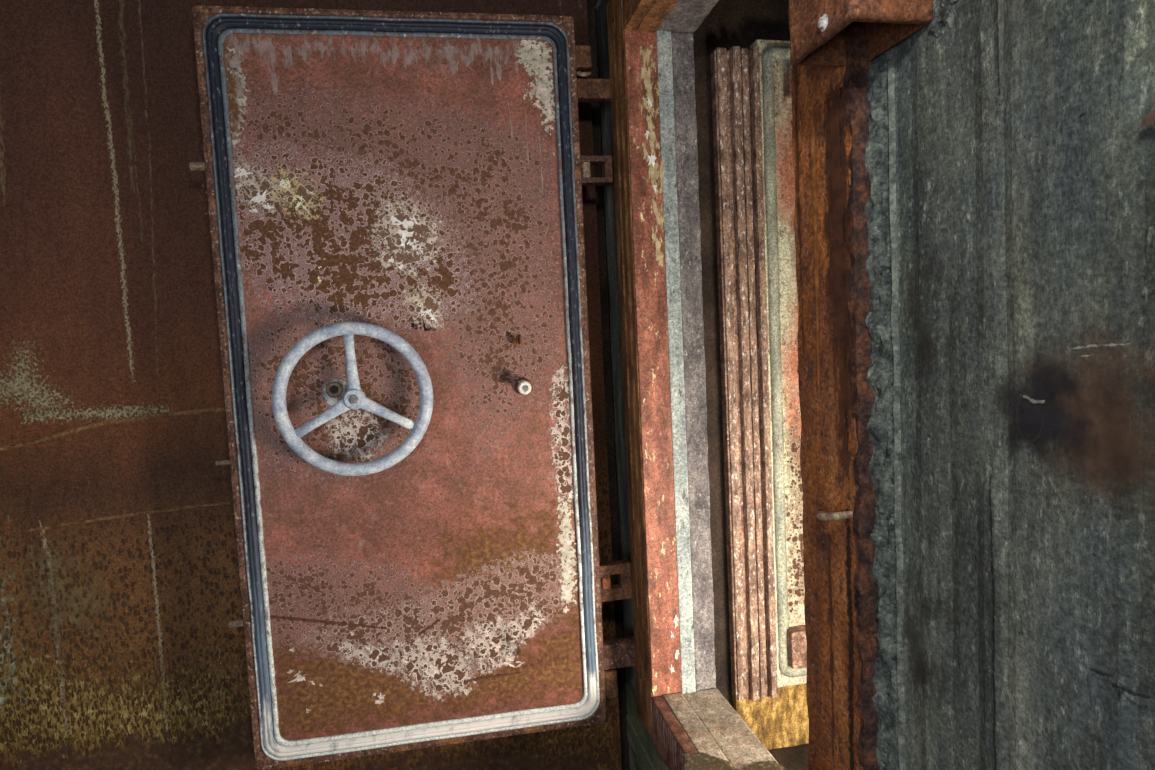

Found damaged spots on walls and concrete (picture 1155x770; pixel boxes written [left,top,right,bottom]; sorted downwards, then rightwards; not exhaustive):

peeling [225,47,480,342]
corrosion [227,76,566,487]
peeling [514,39,556,135]
corrosion [793,65,858,480]
corrosion [265,503,584,737]
peeling [287,365,578,701]